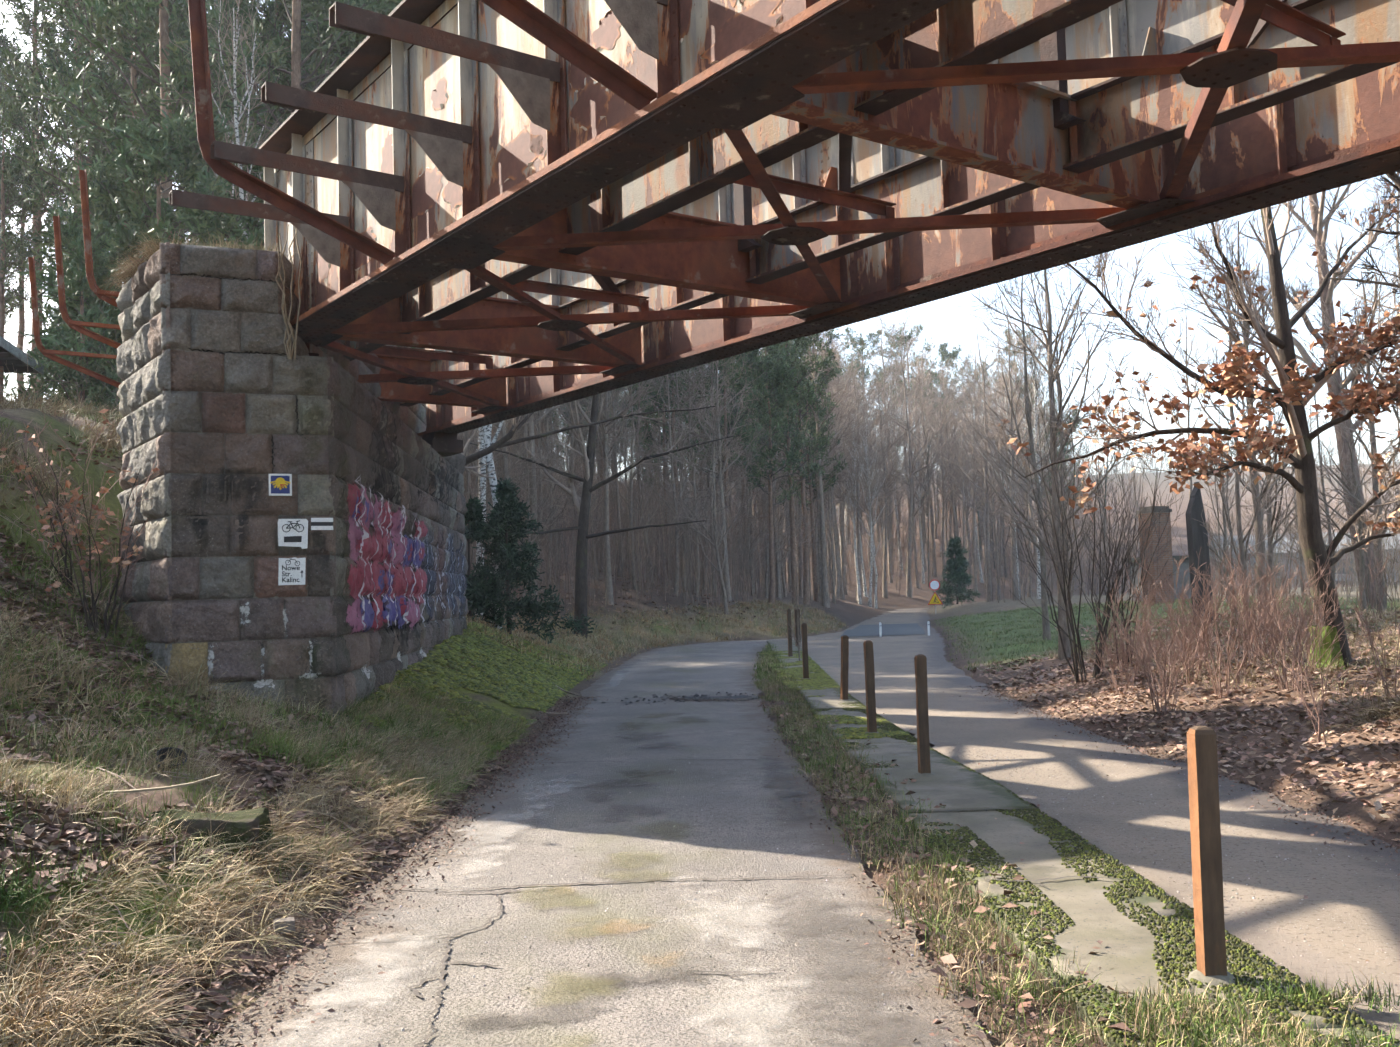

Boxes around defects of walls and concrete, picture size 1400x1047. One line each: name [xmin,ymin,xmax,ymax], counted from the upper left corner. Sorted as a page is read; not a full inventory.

peeling [591,9,621,51]
peeling [678,0,692,43]
peeling [700,0,782,64]
peeling [431,77,447,111]
peeling [570,64,610,131]
peeling [381,131,393,174]
peeling [411,167,462,220]
peeling [354,226,376,271]
crack [332,874,852,1047]